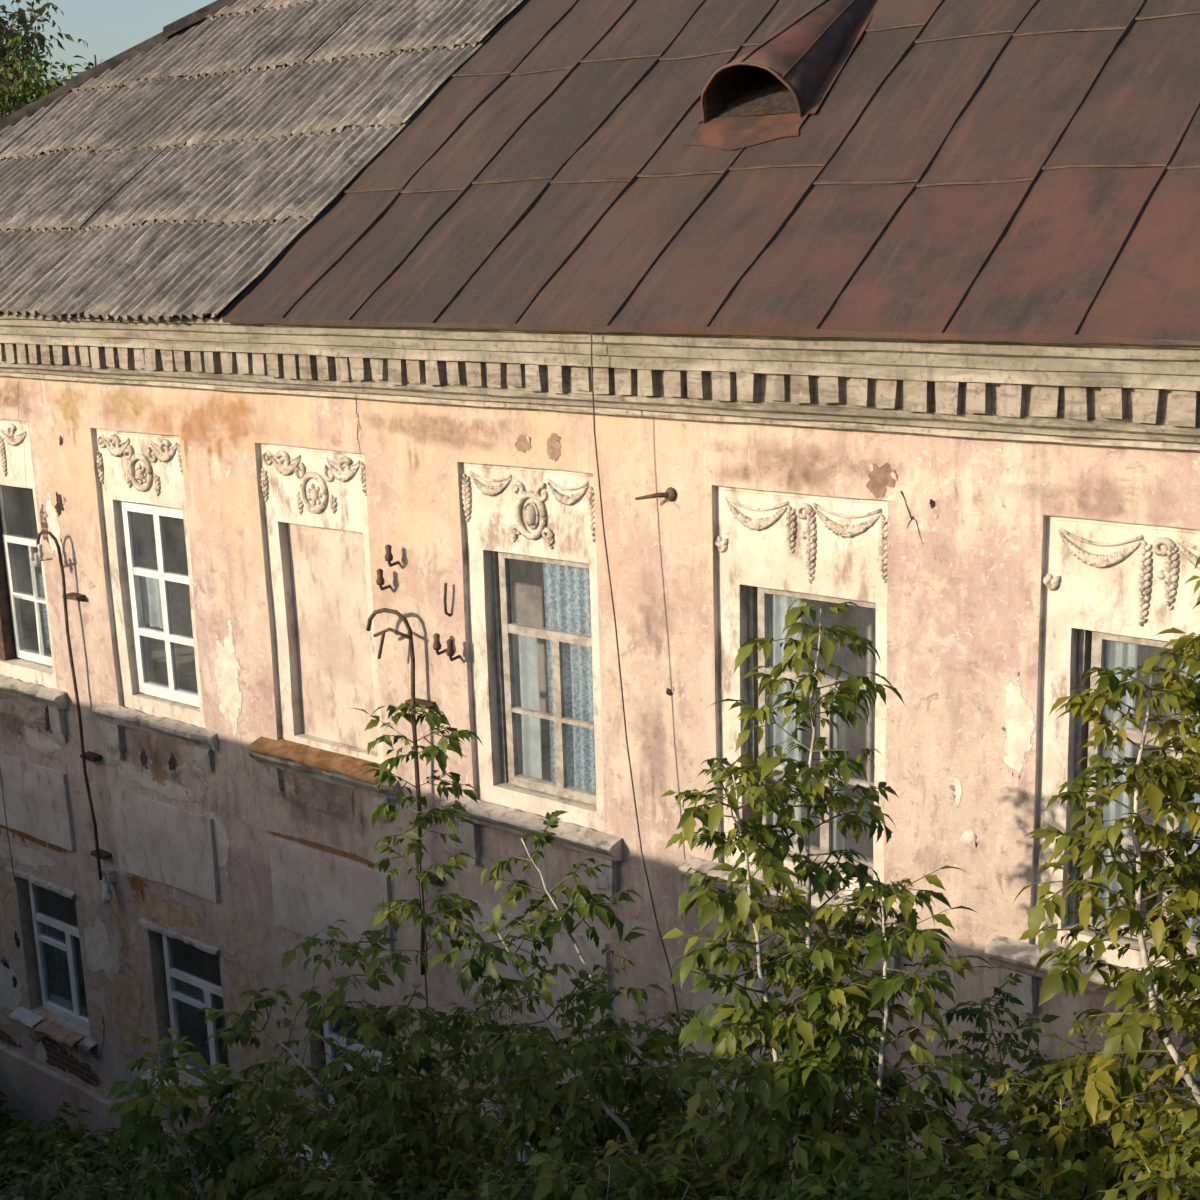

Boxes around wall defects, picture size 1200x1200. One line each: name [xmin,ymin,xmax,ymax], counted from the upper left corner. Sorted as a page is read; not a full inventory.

spalling [515,434,531,453]
spalling [546,432,561,462]
spalling [866,463,898,499]
peeling [213,617,242,739]
peeling [1001,672,1035,779]
peeling [82,914,122,986]
flaking render [0,932,100,1087]